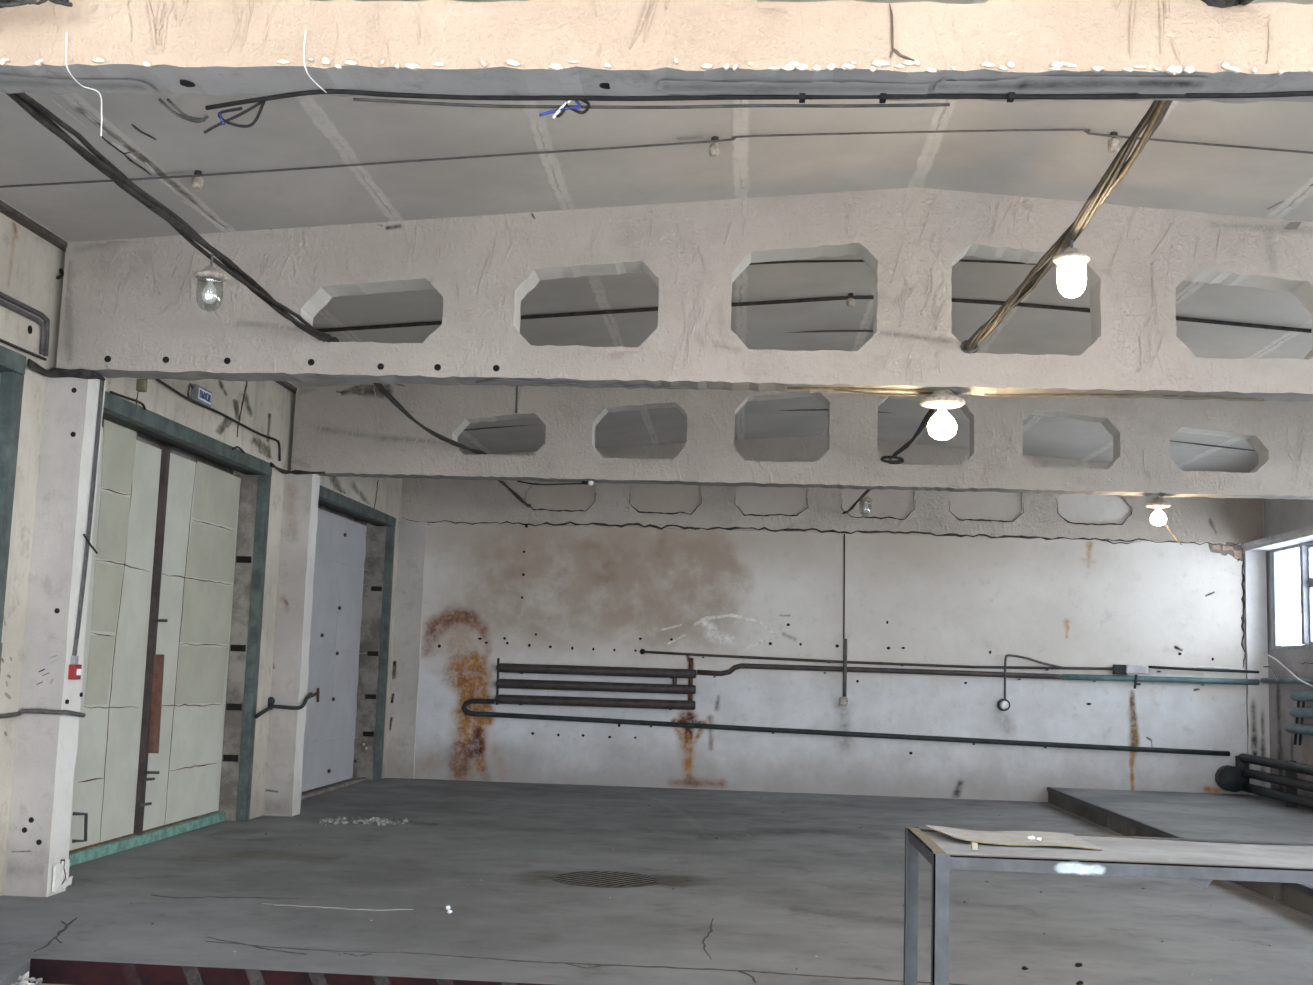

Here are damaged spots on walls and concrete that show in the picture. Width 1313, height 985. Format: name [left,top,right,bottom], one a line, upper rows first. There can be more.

crack [889,4,915,61]
damp [498,558,533,586]
rust [415,601,512,781]
rust [664,708,730,789]
rust [1127,689,1142,790]